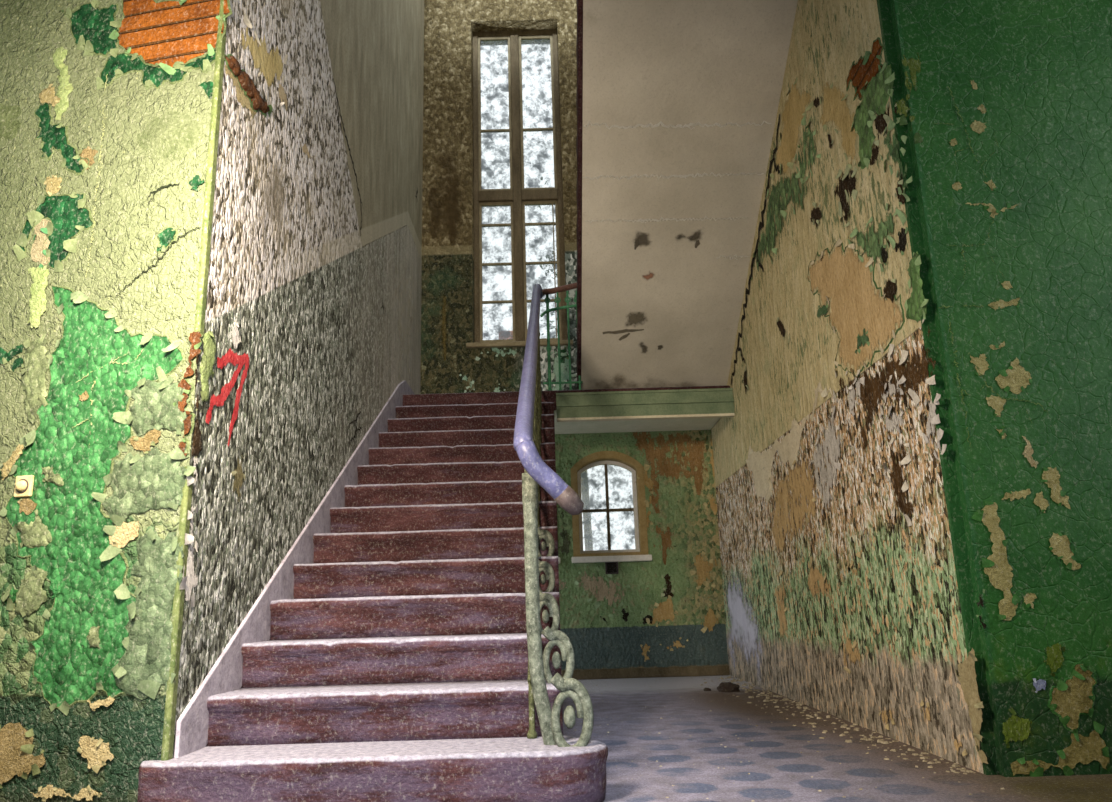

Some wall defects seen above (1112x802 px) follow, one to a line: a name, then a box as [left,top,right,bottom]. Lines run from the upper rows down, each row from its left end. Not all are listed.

peeling [0,0,289,716]
spalling [746,37,929,640]
peeling [923,393,947,459]
spalling [970,342,1033,439]
spalling [690,438,721,633]
spalling [972,436,1070,630]
spalling [0,722,102,802]
spalling [77,736,114,773]
peeling [559,566,678,627]
spalling [640,637,688,662]
spalling [954,648,988,764]
spalling [1002,643,1112,777]